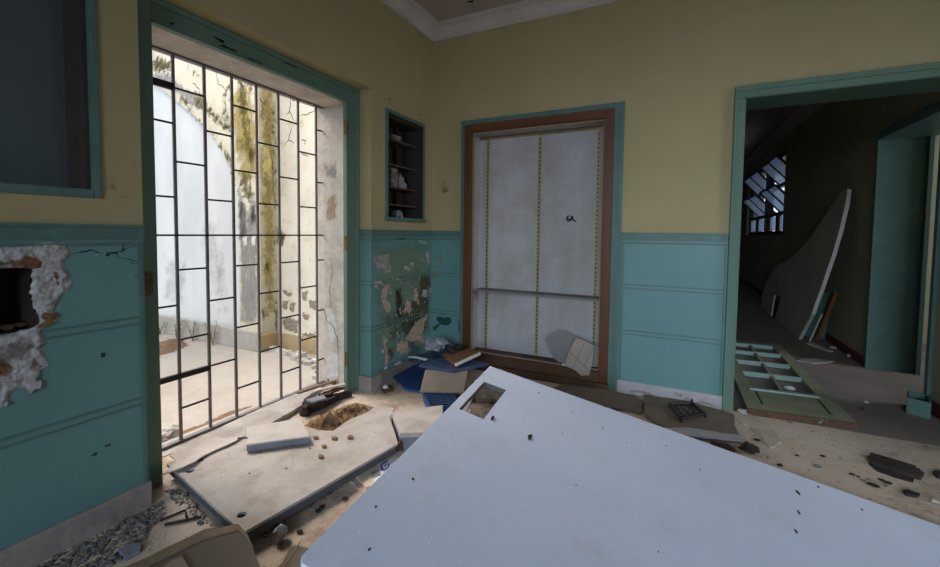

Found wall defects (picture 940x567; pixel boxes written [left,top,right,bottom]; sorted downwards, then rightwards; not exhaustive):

spalling [0,242,72,407]
crack [72,245,144,277]
leakage [153,56,278,331]
peeling [373,240,452,370]